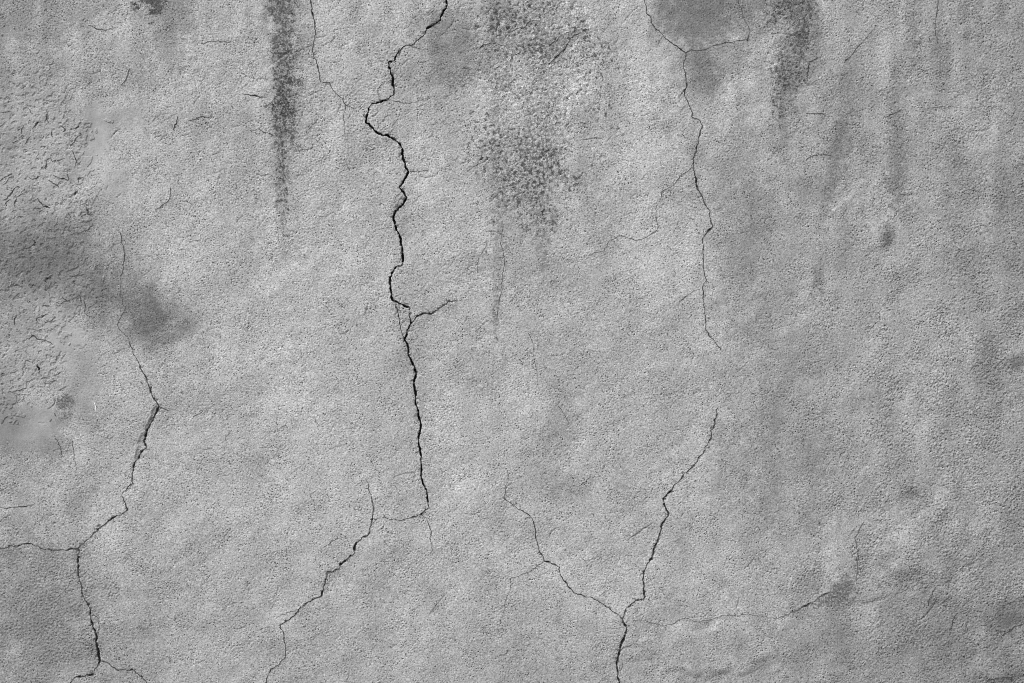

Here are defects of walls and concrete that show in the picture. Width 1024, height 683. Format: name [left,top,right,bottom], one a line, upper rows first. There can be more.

crack [0,233,168,683]
leakage [265,0,303,215]
crack [266,0,458,683]
crack [591,0,750,350]
crack [500,408,936,683]